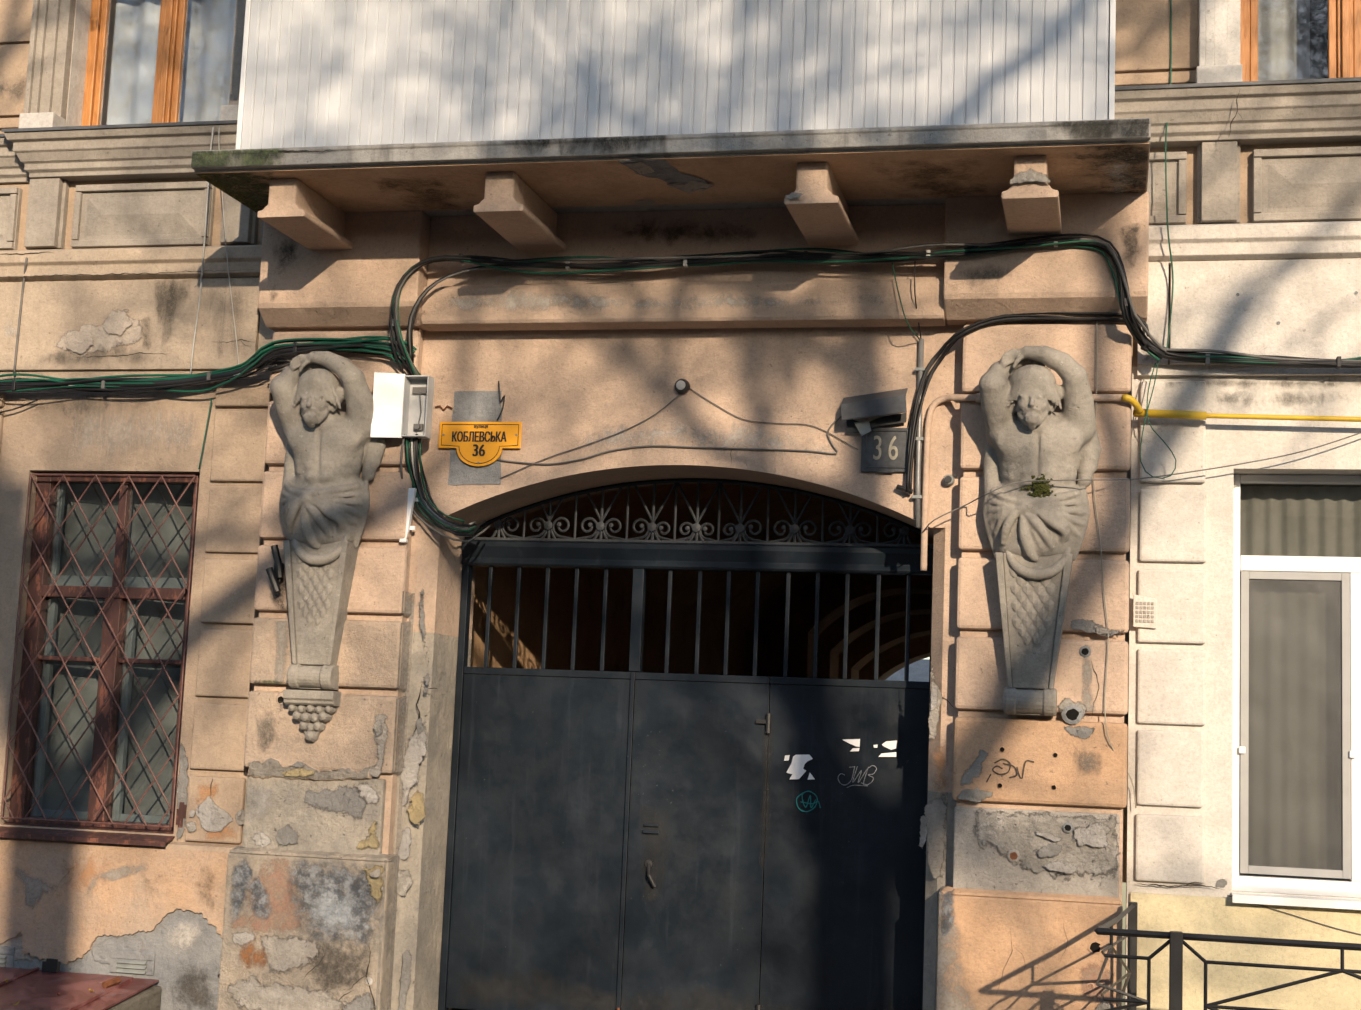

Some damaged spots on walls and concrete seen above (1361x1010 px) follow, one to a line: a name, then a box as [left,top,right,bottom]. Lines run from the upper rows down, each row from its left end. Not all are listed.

flaking render [56,309,143,358]
flaking render [247,714,389,805]
flaking render [176,796,299,847]
flaking render [356,821,380,850]
flaking render [363,718,429,905]
water stain [935,752,972,1010]
flaking render [919,783,1121,881]
flaking render [0,909,347,1010]